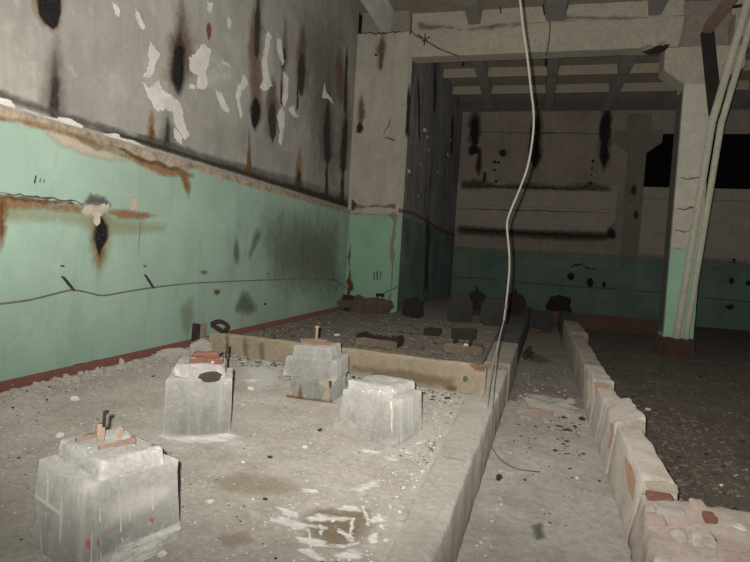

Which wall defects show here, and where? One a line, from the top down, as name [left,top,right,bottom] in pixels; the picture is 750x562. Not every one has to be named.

corrosion [375,39,385,68]
peeling [142,42,190,145]
peeling [260,31,299,146]
water stain [600,112,611,167]
corrosion [121,149,191,191]
corrosion [0,192,85,242]
spalling [81,196,109,261]
corrosion [112,210,149,218]